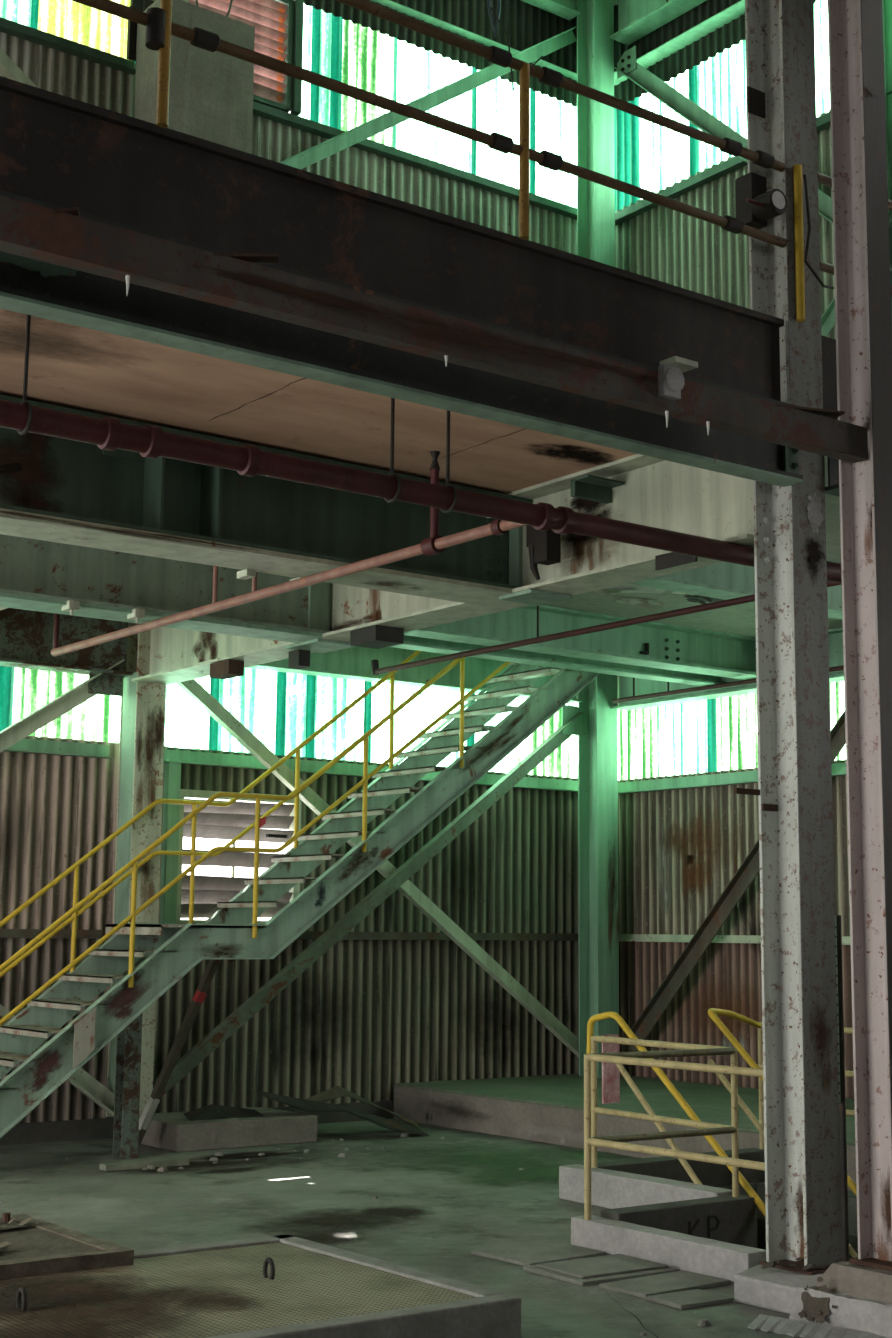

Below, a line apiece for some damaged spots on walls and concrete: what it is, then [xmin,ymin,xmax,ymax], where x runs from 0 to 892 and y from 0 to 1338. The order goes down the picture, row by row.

rust [194,631,216,663]
rust [137,711,163,812]
water stain [260,1207,425,1244]
water stain [0,1276,250,1338]